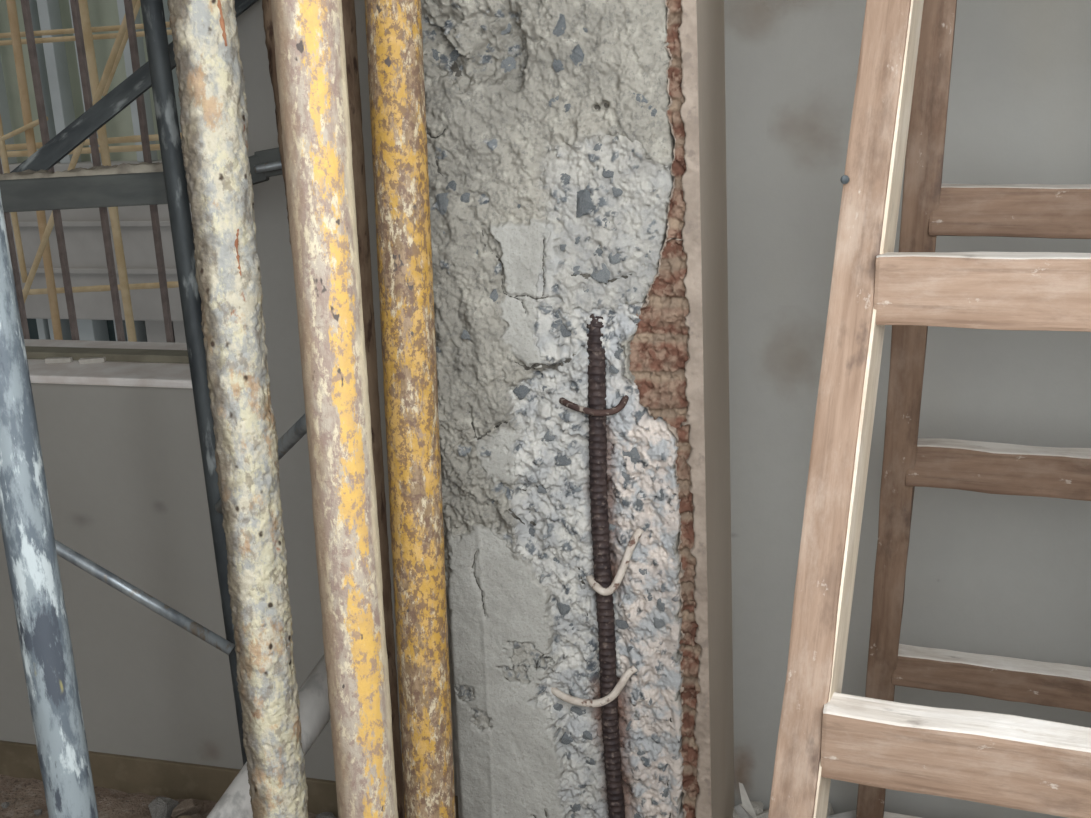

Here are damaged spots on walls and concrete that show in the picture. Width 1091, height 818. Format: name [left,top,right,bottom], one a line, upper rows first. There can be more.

crack [482,230,549,313]
crack [571,274,632,285]
spalling [436,0,701,818]
crack [472,551,486,616]